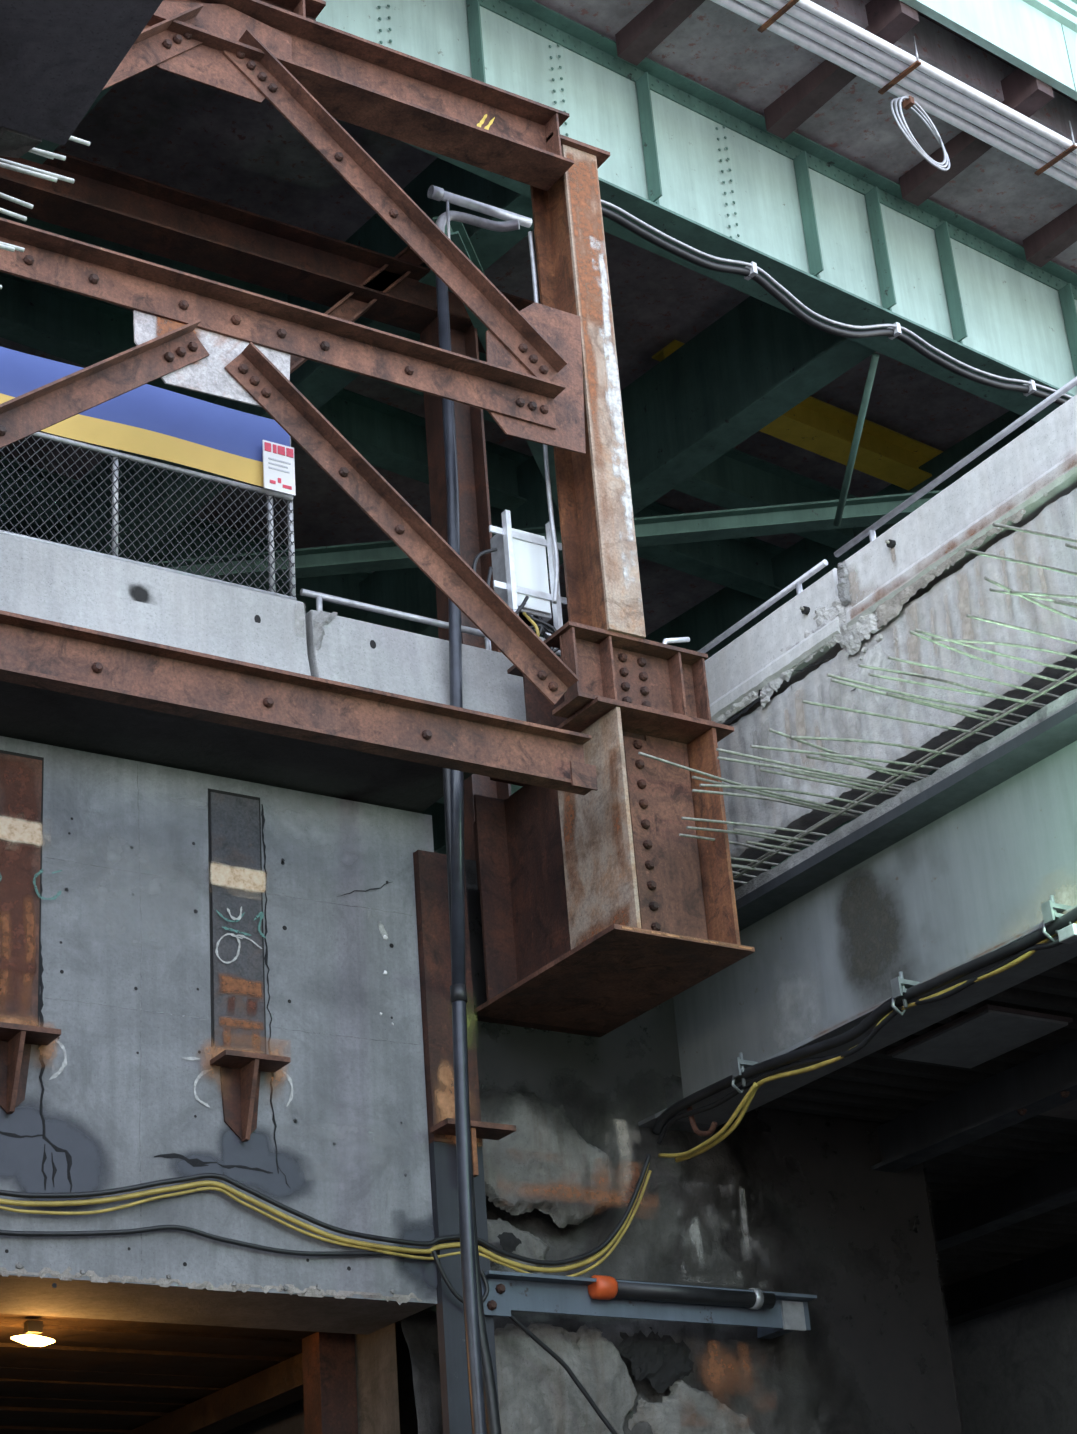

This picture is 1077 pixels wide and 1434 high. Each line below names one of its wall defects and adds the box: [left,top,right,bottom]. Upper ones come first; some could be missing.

rust [567,154,613,462]
spalling [638,509,1077,884]
rust [0,760,37,822]
rust [0,840,35,997]
rust [577,906,680,946]
crack [0,945,72,1192]
damp [0,1104,106,1212]
crack [154,804,290,1188]
damp [174,1127,310,1199]
rust [206,975,284,1084]
rust [437,1065,456,1144]
spalling [618,1327,694,1393]